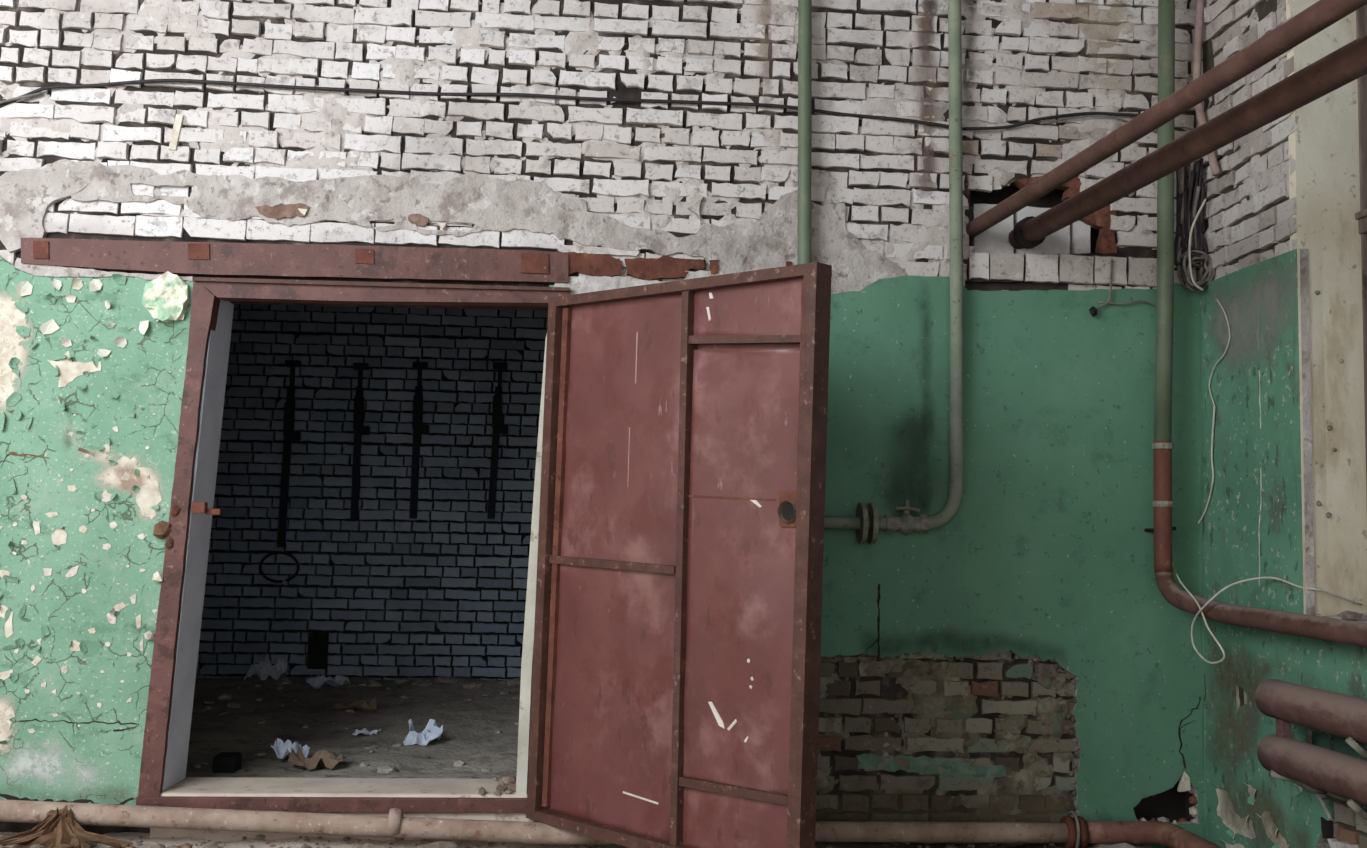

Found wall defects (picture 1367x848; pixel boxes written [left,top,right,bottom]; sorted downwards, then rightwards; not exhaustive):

damp [922,152,933,188]
spalling [255,203,310,220]
spalling [1078,205,1117,254]
corrosion [554,244,723,295]
peeling [0,274,149,438]
crack [1,447,107,467]
peeling [0,412,180,750]
crack [14,718,138,732]
spalling [816,650,1089,822]
spalling [1133,771,1198,824]
peeling [1212,782,1289,848]
spalling [1320,817,1359,848]